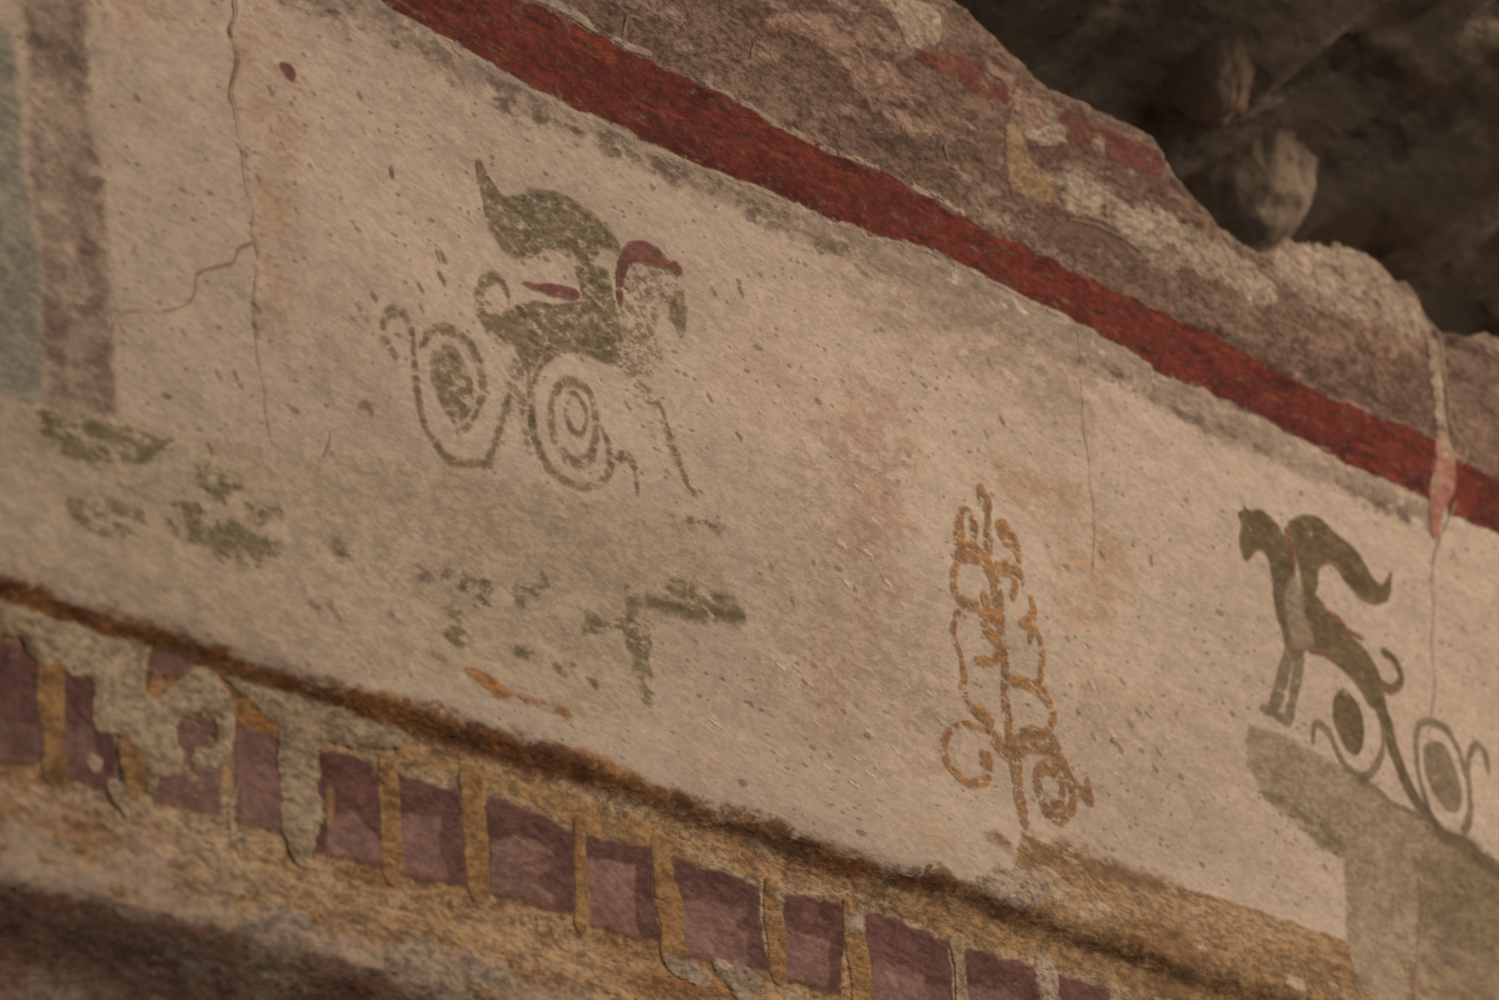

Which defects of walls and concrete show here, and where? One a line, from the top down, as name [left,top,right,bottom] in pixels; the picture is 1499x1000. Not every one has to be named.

crack [113,0,273,436]
flaking render [763,0,955,145]
flaking render [984,57,1431,359]
crack [1428,332,1468,766]